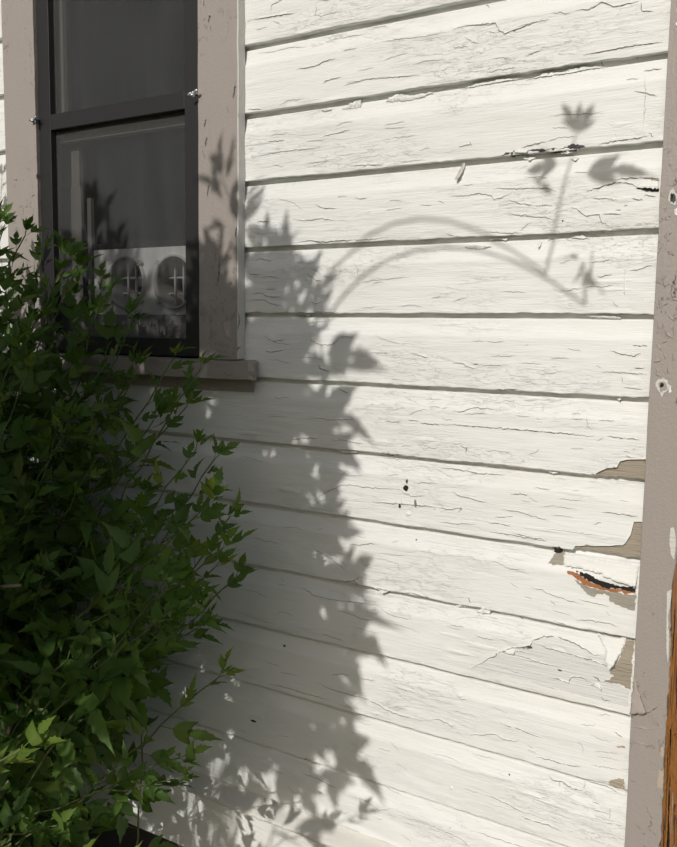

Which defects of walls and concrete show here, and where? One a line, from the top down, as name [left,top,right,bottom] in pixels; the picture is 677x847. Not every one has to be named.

crack [466,42,659,148]
crack [280,195,383,243]
crack [249,258,348,393]
crack [255,527,416,633]
crack [267,561,677,830]
peeling [472,623,630,707]
crack [636,752,675,847]